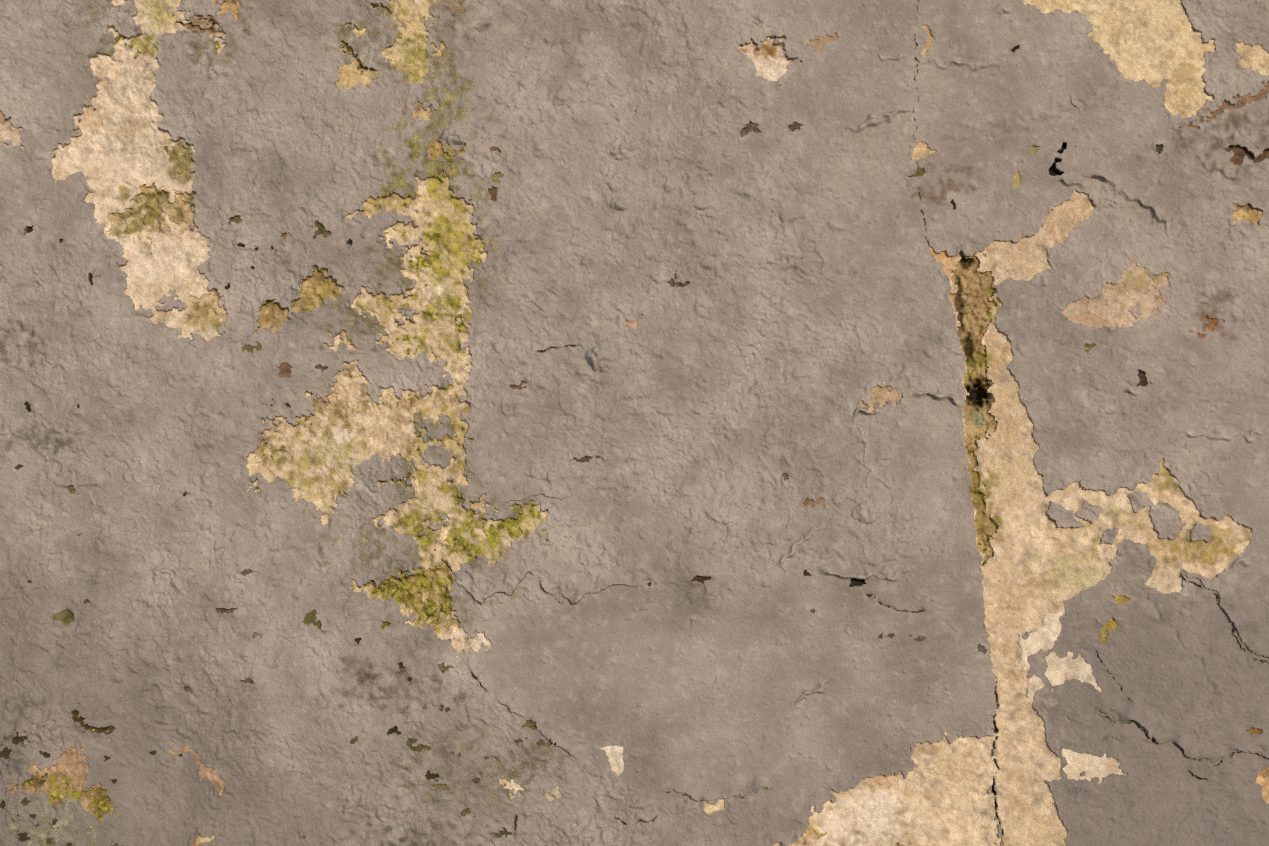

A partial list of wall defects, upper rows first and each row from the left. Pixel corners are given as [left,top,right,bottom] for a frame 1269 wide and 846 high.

peeling [52,0,241,341]
peeling [335,0,454,90]
peeling [737,36,802,87]
crack [909,0,930,247]
peeling [1022,0,1269,130]
peeling [238,140,549,673]
flaking render [774,189,1269,846]
peeling [0,731,117,846]
spalling [387,726,431,753]
spalling [513,720,557,747]
peeling [599,745,624,776]
crack [991,690,1002,842]